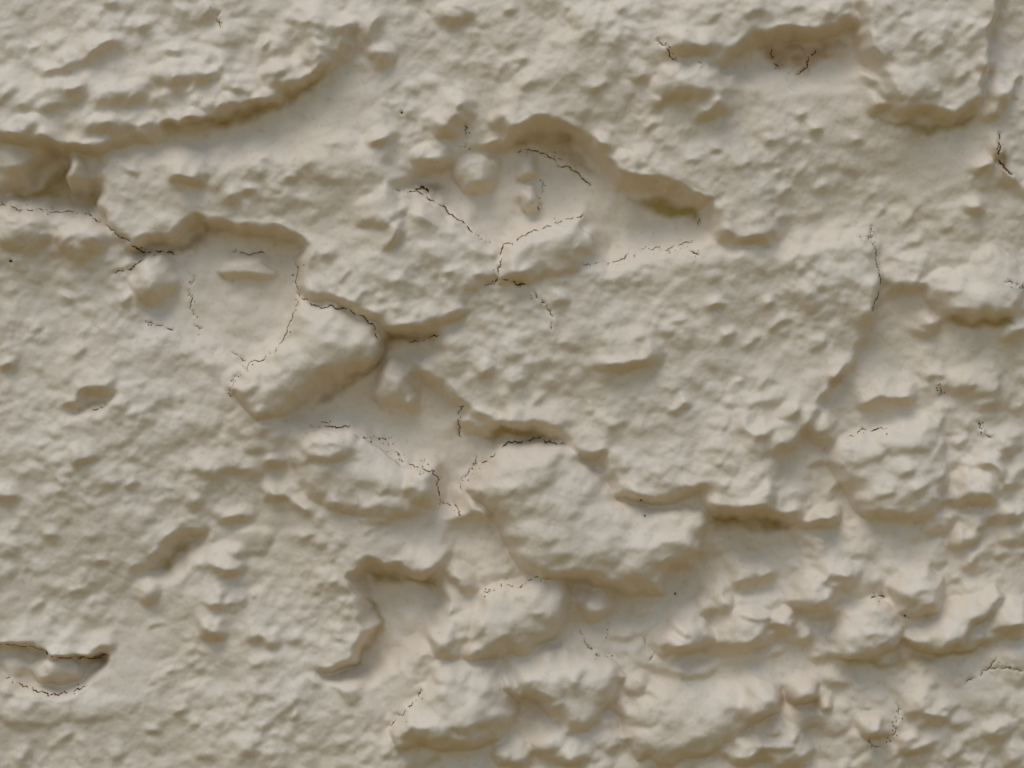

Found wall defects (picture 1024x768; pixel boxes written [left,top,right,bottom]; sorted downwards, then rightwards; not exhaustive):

crack [1,202,174,273]
crack [396,149,591,329]
crack [587,218,701,265]
crack [859,228,881,310]
crack [228,262,378,396]
crack [312,421,564,517]
crack [8,677,84,696]
crack [0,644,108,659]